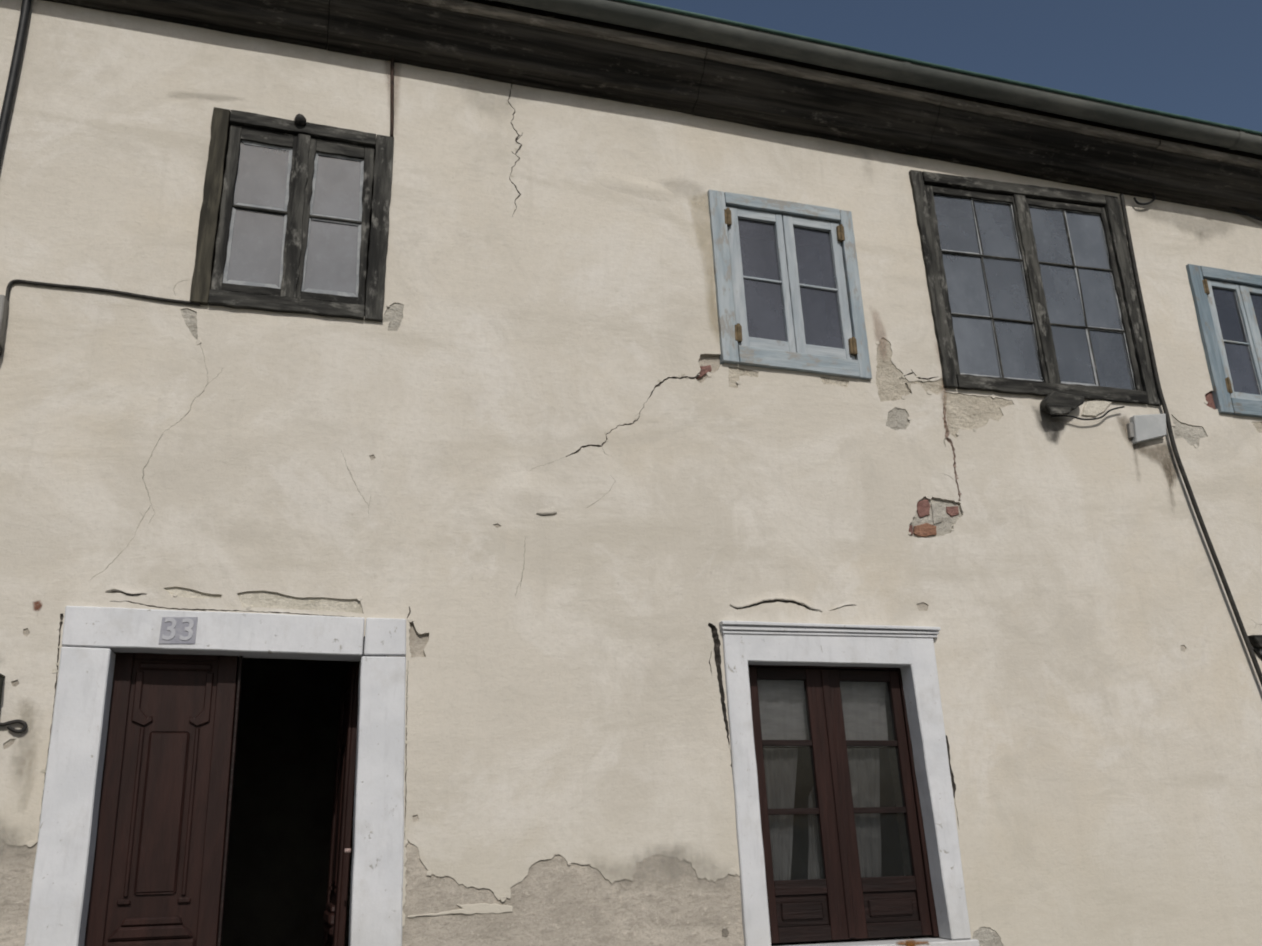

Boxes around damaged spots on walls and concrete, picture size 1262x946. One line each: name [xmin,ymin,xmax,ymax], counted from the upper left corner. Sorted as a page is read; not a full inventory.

crack [505,85,523,214]
flaking render [383,303,404,331]
crack [530,373,700,509]
crack [900,369,962,501]
flaking render [875,338,1013,438]
flaking render [908,495,962,538]
flaking render [164,587,222,599]
flaking render [237,591,363,614]
flaking render [408,618,429,658]
crack [708,623,732,767]
flaking render [0,841,38,946]
flaking render [402,839,744,946]